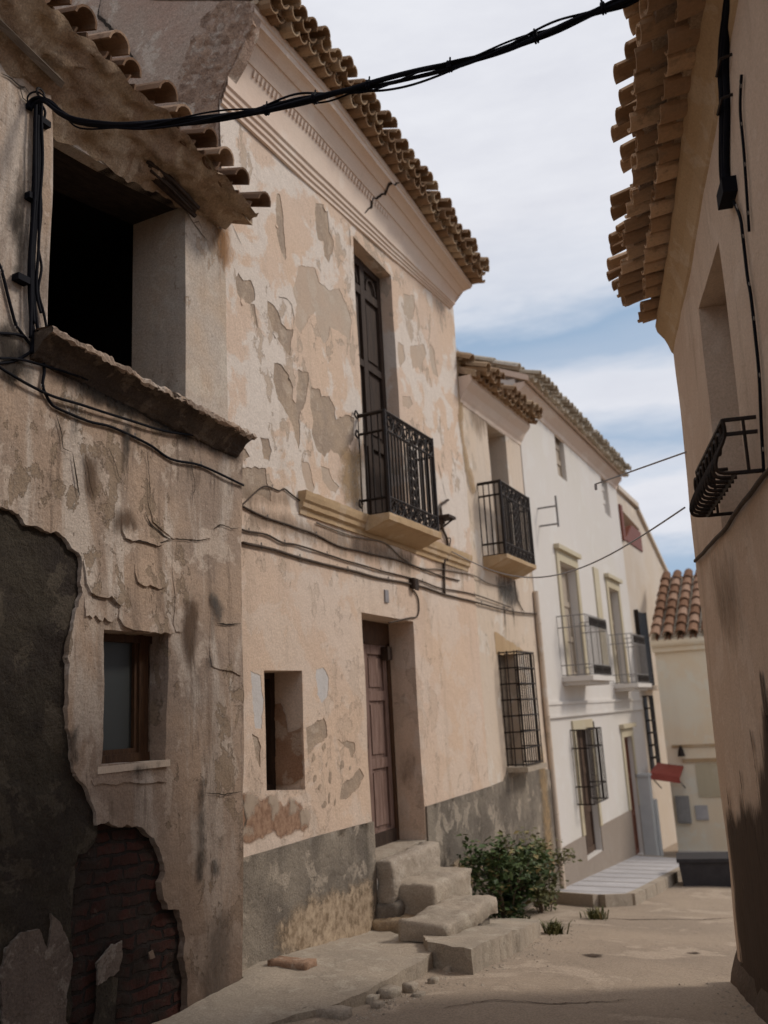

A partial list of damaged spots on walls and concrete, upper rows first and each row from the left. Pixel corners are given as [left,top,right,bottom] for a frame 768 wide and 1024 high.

peeling [275,194,286,259]
peeling [315,203,333,262]
crack [349,182,400,246]
peeling [236,265,354,501]
peeling [398,342,438,377]
flaking render [0,509,182,1024]
flaking render [243,668,364,843]
water stain [726,672,768,995]